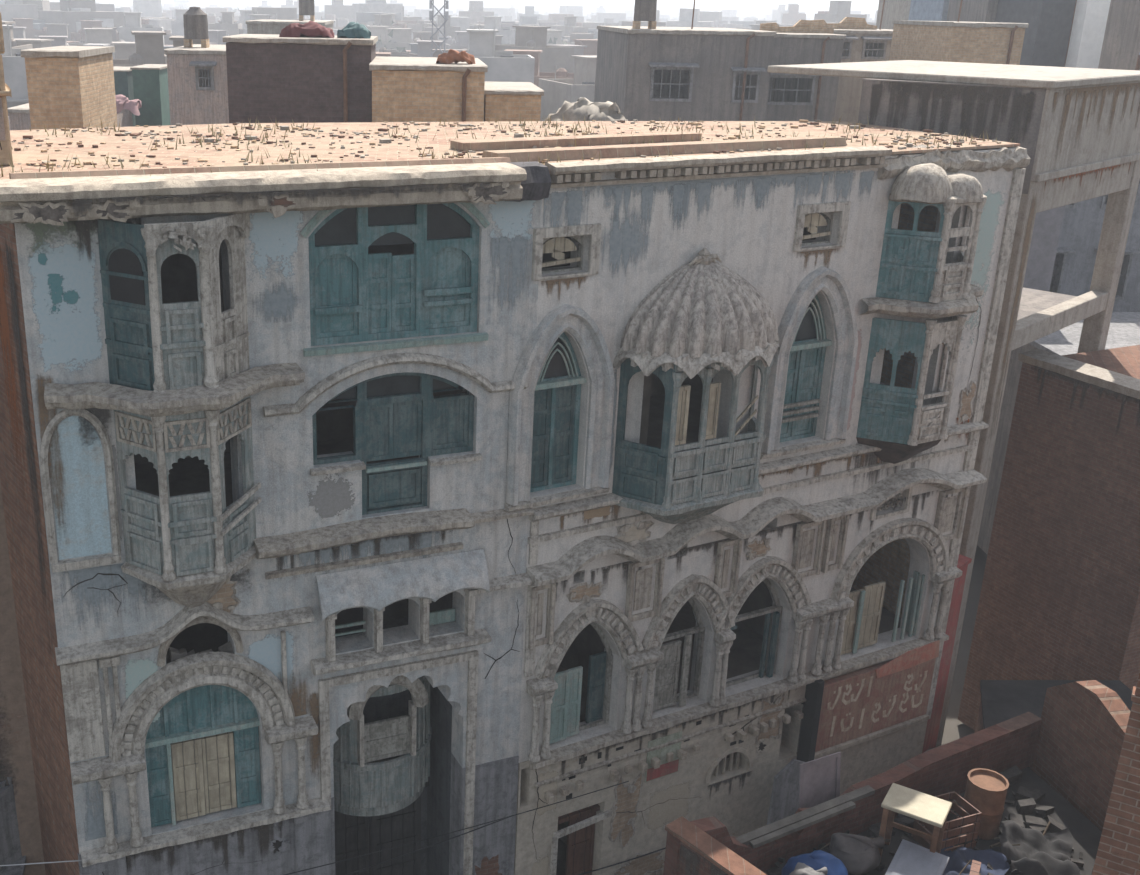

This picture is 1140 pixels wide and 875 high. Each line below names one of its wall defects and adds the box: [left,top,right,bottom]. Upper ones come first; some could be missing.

spalling [11,197,143,226]
water stain [543,170,874,272]
corrosion [1045,162,1131,186]
peeling [28,239,103,372]
peeling [308,473,356,519]
crack [64,573,128,612]
crack [484,600,520,679]
spalling [608,772,643,849]